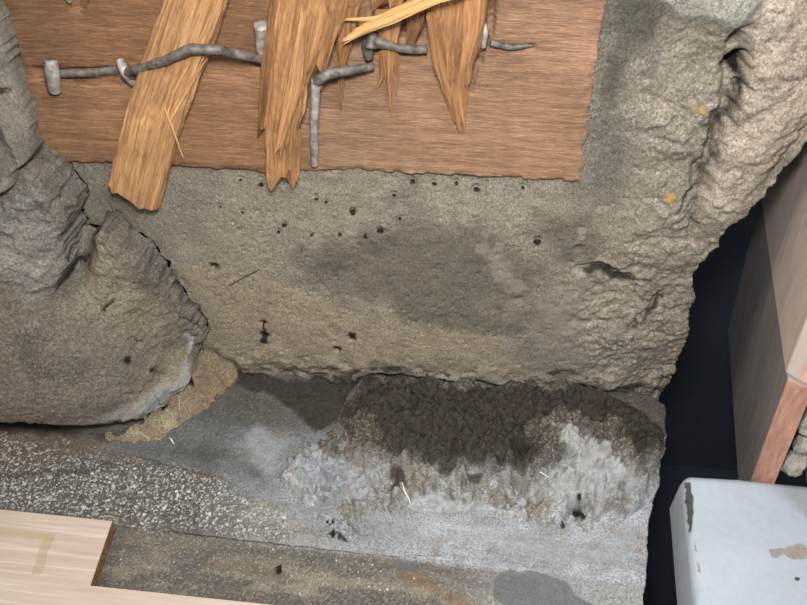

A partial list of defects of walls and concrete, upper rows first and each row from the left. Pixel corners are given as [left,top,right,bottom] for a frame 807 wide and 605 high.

crack [712,59,744,127]
crack [56,254,90,289]
damp [236,366,665,474]
damp [285,443,373,504]
damp [391,466,404,487]
damp [403,490,474,513]
damp [528,422,636,515]